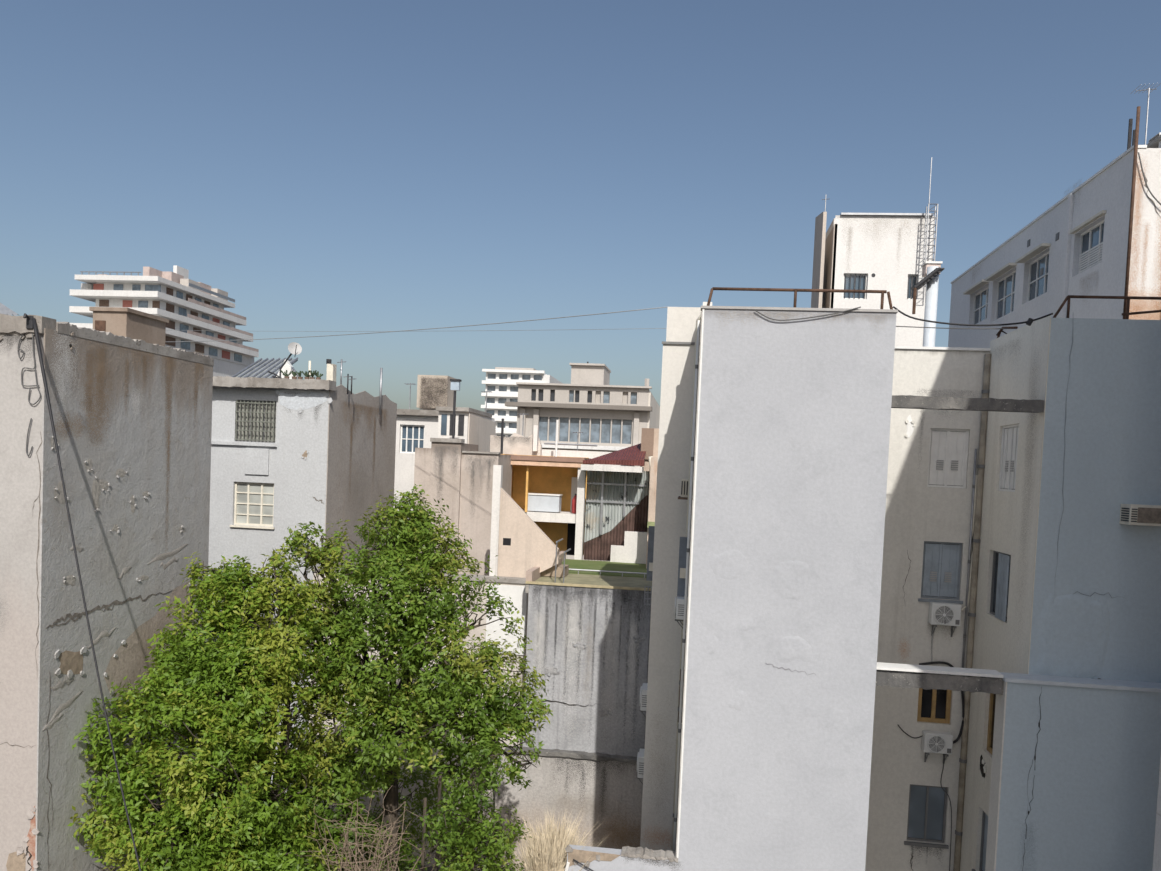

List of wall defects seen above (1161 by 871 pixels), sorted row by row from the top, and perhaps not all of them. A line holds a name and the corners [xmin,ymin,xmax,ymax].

damp [48,321,178,556]
spalling [6,806,39,871]
spalling [54,647,87,679]
crack [0,432,172,871]
damp [529,586,683,870]
crack [1022,687,1042,871]